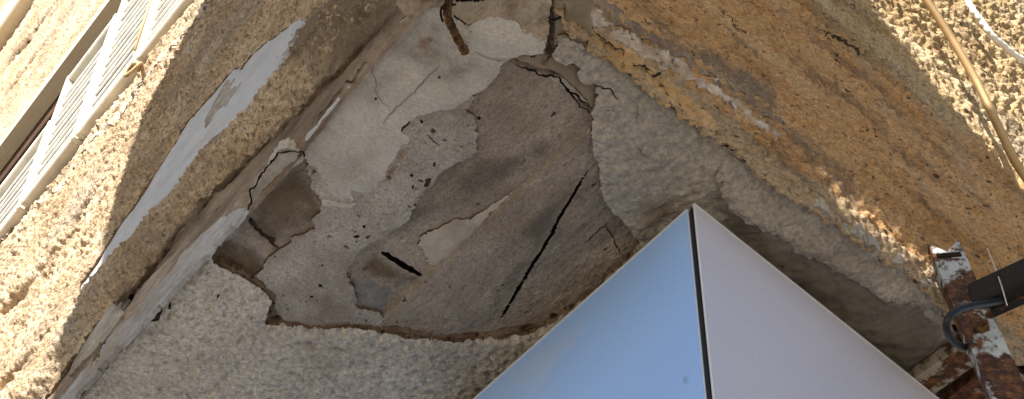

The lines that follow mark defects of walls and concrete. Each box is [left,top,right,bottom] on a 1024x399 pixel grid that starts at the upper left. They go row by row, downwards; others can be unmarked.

crack [476,0,650,161]
crack [113,144,305,306]
spalling [60,0,784,399]